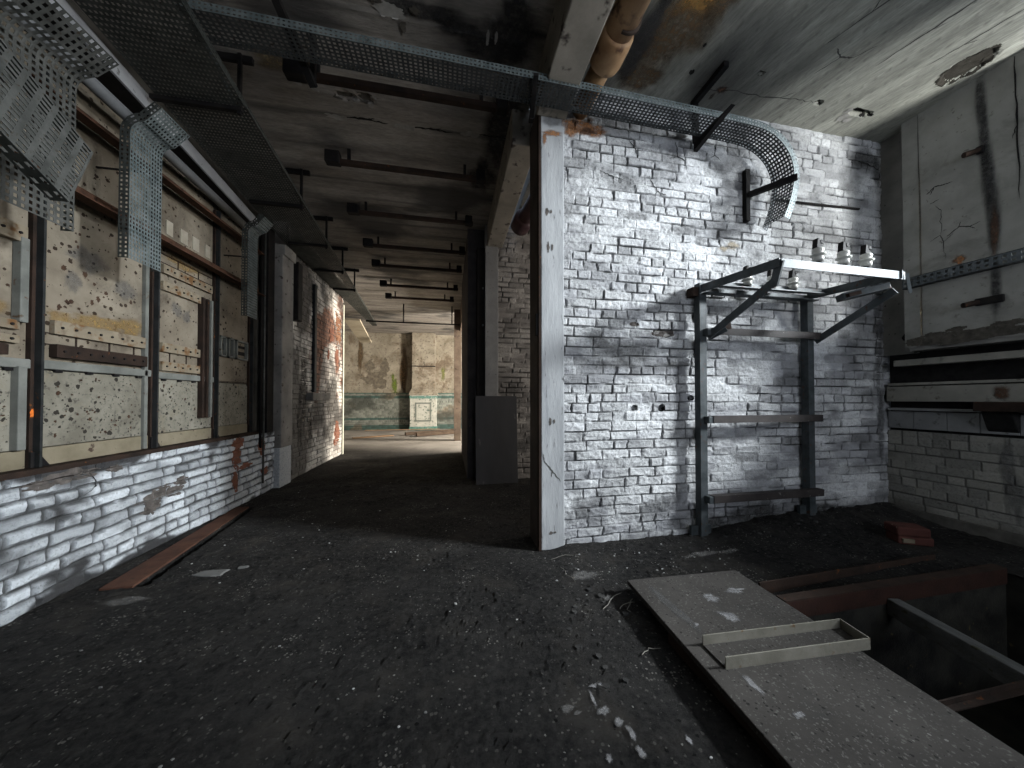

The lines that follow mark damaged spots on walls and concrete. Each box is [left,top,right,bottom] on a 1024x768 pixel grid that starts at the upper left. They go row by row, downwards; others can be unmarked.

water stain [437,0,537,64]
spalling [935,44,1002,87]
rust [543,118,605,144]
crack [1012,56,1020,197]
water stain [976,82,1000,247]
crack [917,115,980,342]
flaking render [327,313,341,367]
peeling [134,475,189,515]